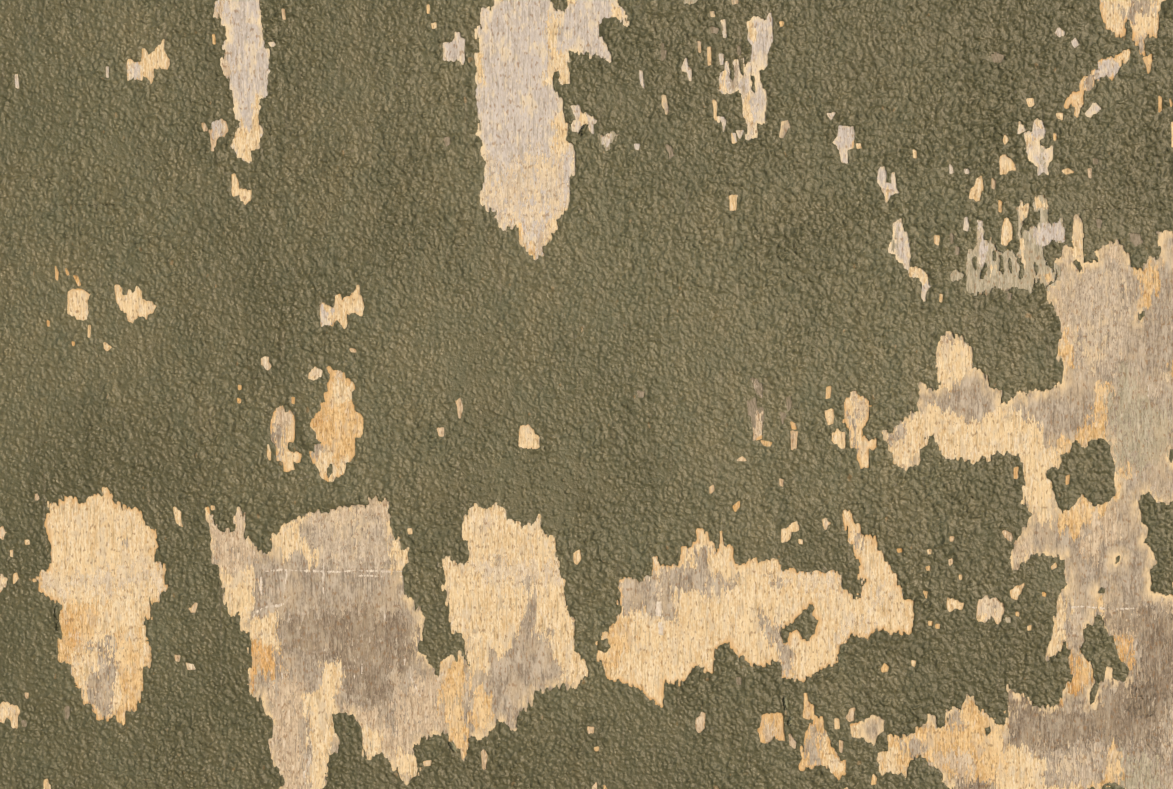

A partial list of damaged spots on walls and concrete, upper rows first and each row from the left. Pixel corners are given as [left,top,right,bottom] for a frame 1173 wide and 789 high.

peeling [210,0,270,163]
peeling [443,0,630,260]
peeling [712,13,773,140]
peeling [779,120,791,138]
peeling [1064,0,1165,118]
peeling [115,284,156,323]
peeling [205,194,1173,789]
peeling [0,572,19,592]
peeling [33,487,168,725]